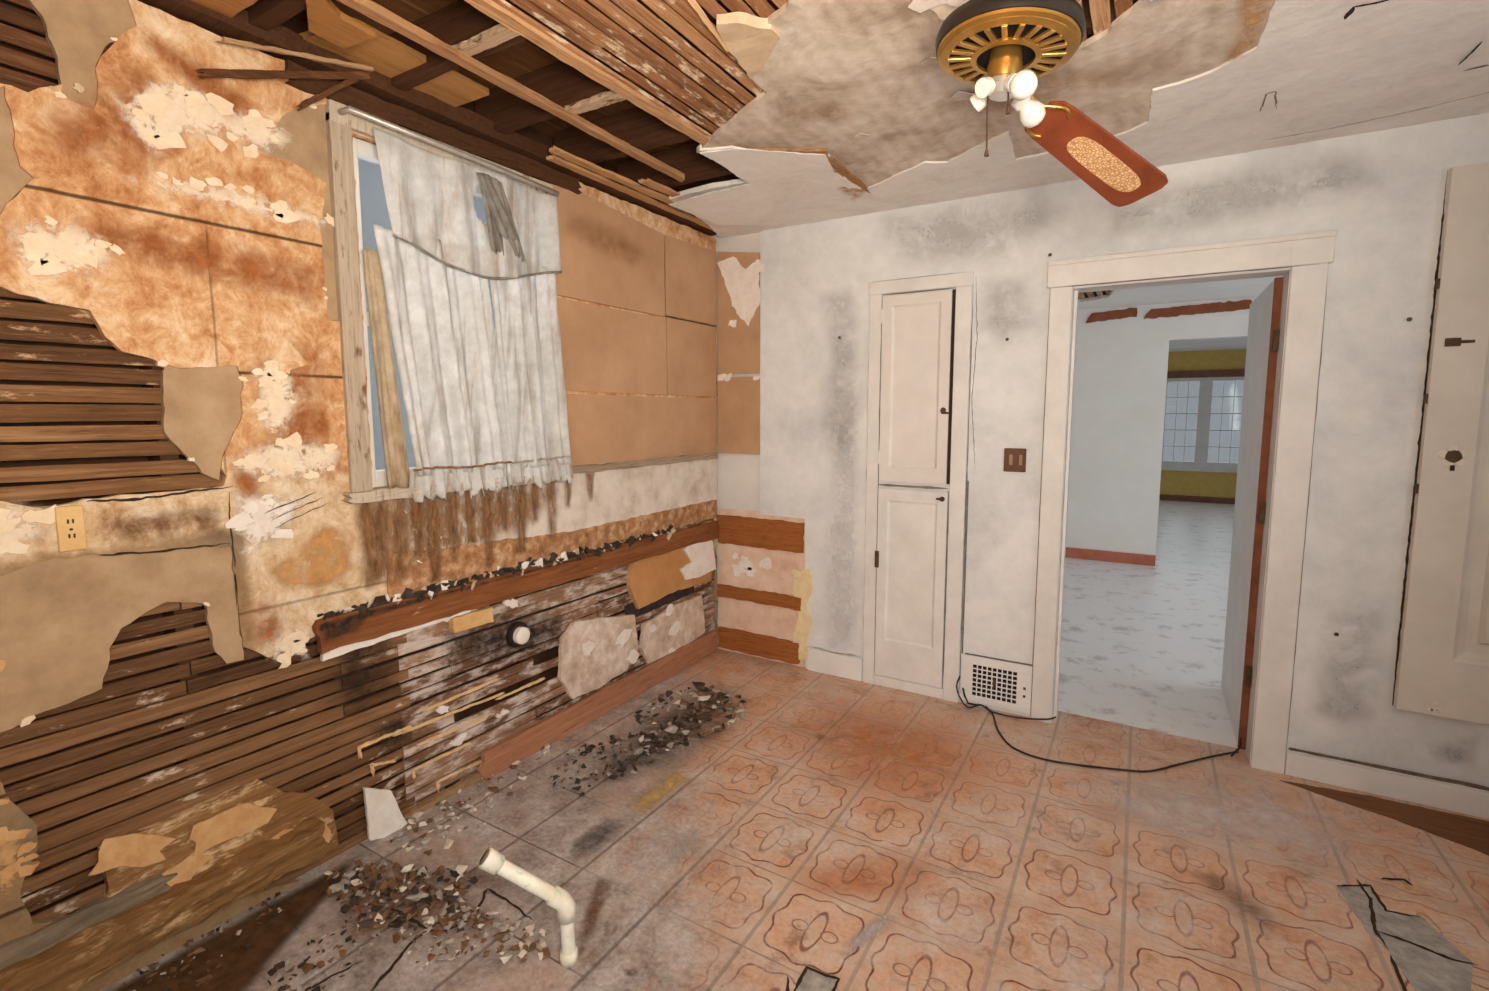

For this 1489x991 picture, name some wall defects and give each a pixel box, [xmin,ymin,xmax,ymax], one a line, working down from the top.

peeling [0,0,136,214]
peeling [492,0,1048,226]
peeling [1034,0,1275,135]
peeling [14,216,125,276]
peeling [120,82,338,321]
peeling [717,257,765,327]
flaking render [0,288,814,920]
spalling [785,966,840,991]
spalling [1337,879,1478,991]